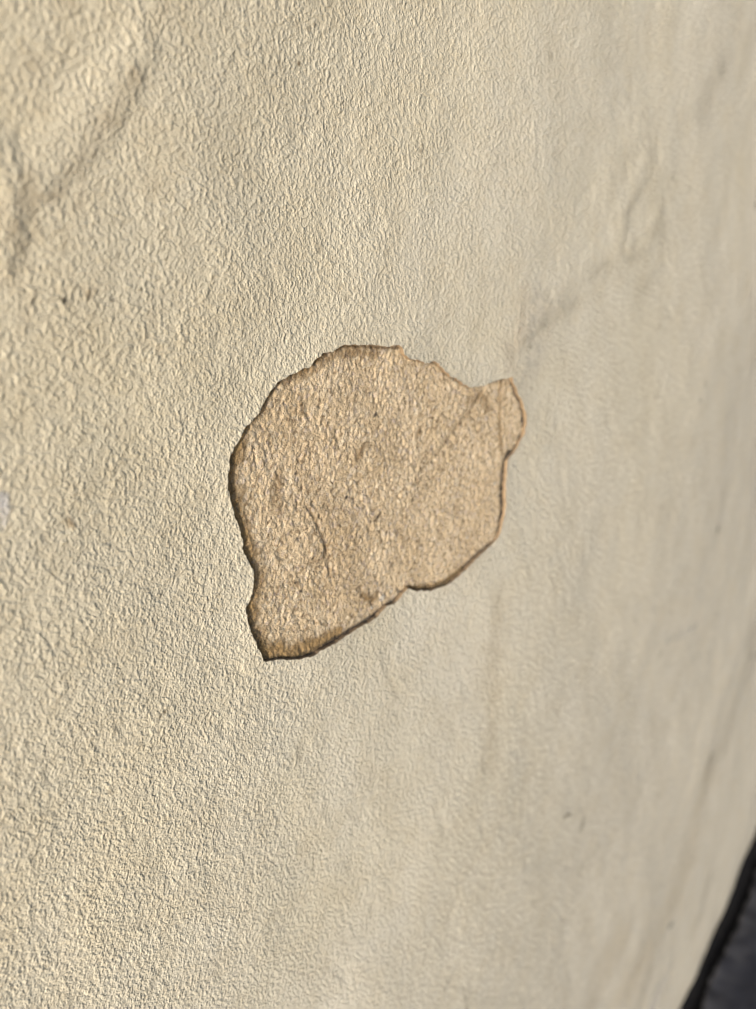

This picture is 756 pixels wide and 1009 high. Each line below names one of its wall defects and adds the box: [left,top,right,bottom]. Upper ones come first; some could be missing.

peeling [228,344,527,662]